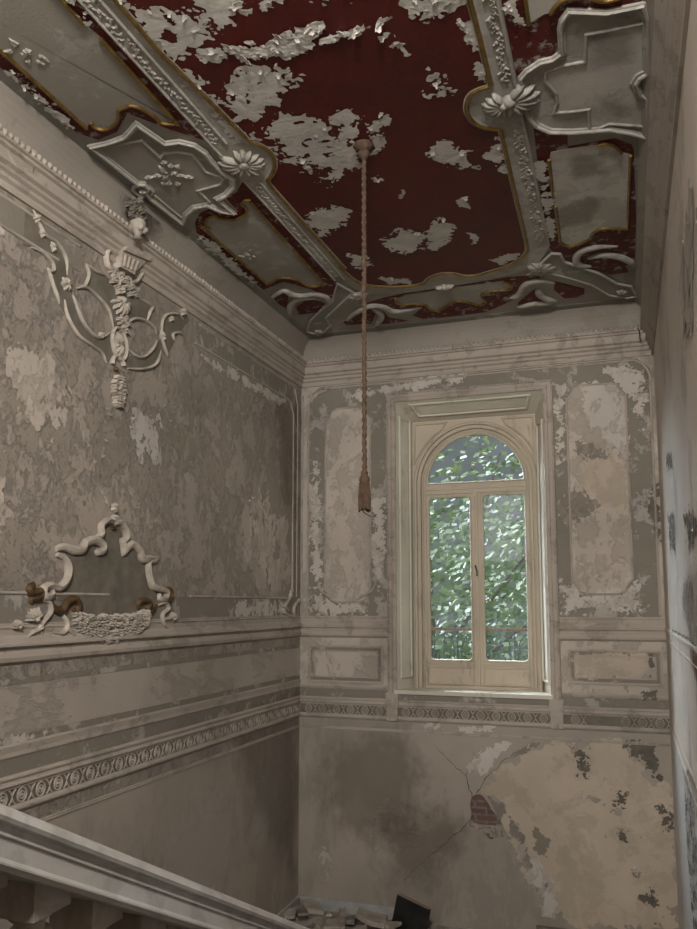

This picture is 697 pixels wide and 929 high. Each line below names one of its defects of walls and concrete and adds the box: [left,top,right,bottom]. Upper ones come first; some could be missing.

peeling [398,0,486,82]
peeling [502,0,526,26]
peeling [111,0,411,188]
peeling [421,67,457,99]
peeling [425,136,513,174]
peeling [304,205,353,237]
peeling [379,217,457,255]
peeling [6,342,72,431]
peeling [127,407,163,466]
peeling [552,363,649,465]
peeling [308,461,387,619]
peeling [457,725,679,929]